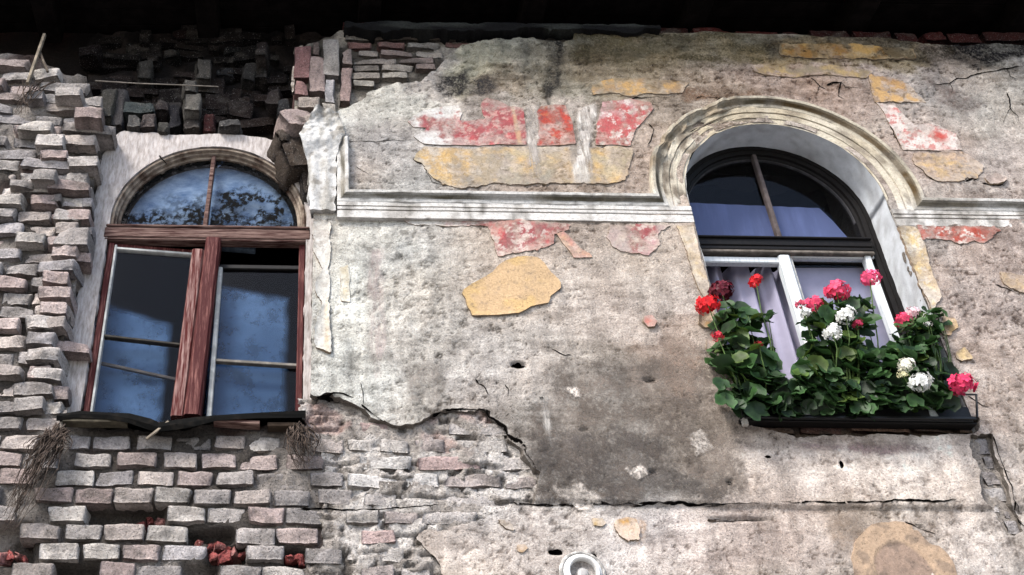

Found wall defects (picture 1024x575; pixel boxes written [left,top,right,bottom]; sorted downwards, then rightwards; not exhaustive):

spalling [288,30,470,112]
peeling [751,43,1007,185]
crack [933,66,1021,125]
spalling [0,53,539,575]
peeling [404,219,592,317]
peeling [897,225,1001,339]
peeling [955,347,973,362]
crack [321,385,392,426]
crack [433,380,536,468]
leakage [531,343,746,510]
crack [510,499,759,522]
spalling [761,421,1020,536]